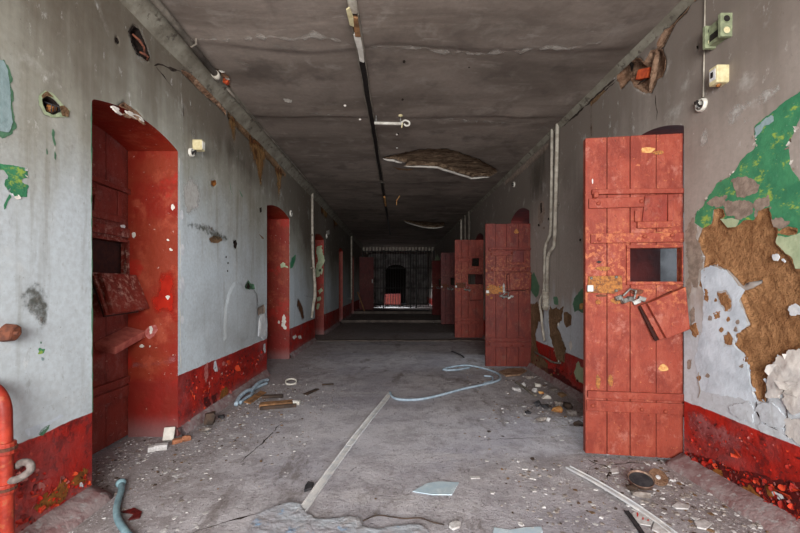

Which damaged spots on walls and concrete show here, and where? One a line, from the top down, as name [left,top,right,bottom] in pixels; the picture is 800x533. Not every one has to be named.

hole [128,26,150,61]
flaking render [617,0,696,119]
peeling [0,60,17,138]
hole [42,91,69,117]
peeling [0,164,29,209]
flaking render [383,149,497,180]
mould [26,288,46,322]
peeling [315,245,326,309]
flaking render [531,273,583,393]
flaking render [685,92,800,403]
peeling [684,414,800,521]